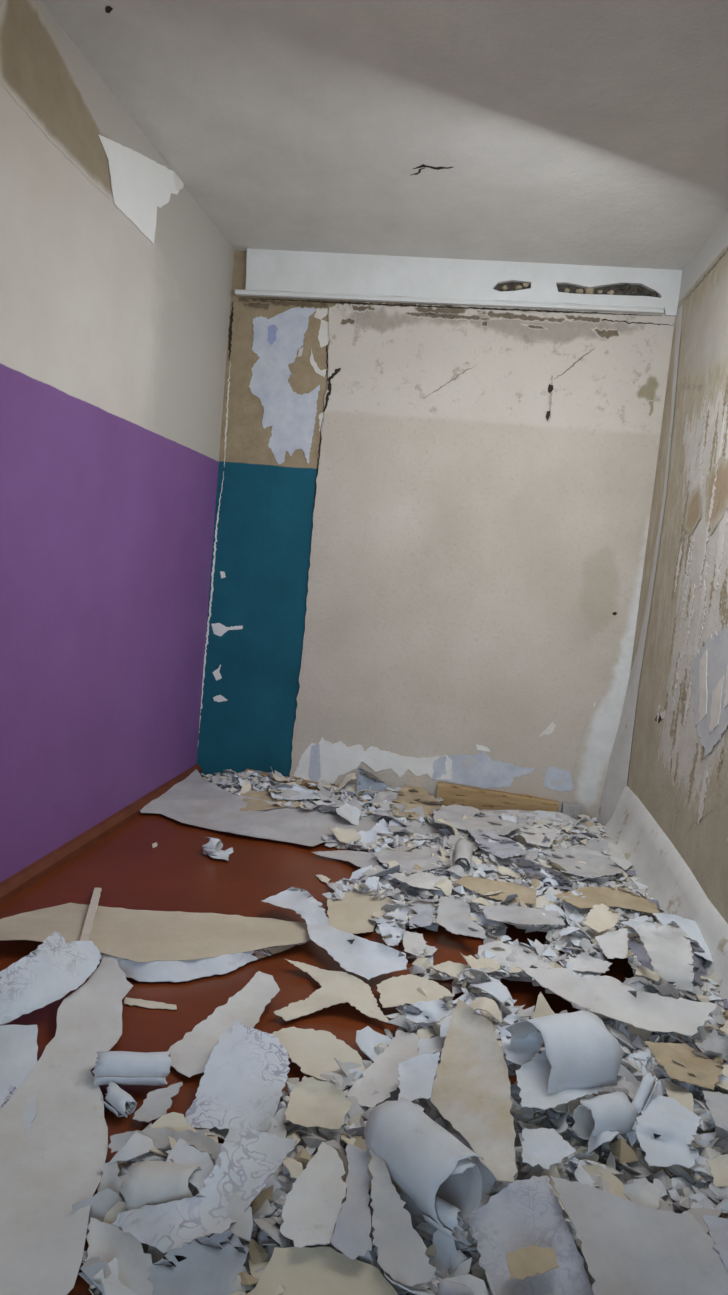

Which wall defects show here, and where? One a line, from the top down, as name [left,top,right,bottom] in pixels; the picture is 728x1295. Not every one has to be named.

flaking render [0,0,118,202]
flaking render [494,282,531,292]
flaking render [557,284,660,298]
peeling [249,305,330,464]
peeling [211,623,243,637]
peeling [652,374,728,832]
peeling [213,665,227,702]
peeling [294,737,574,792]